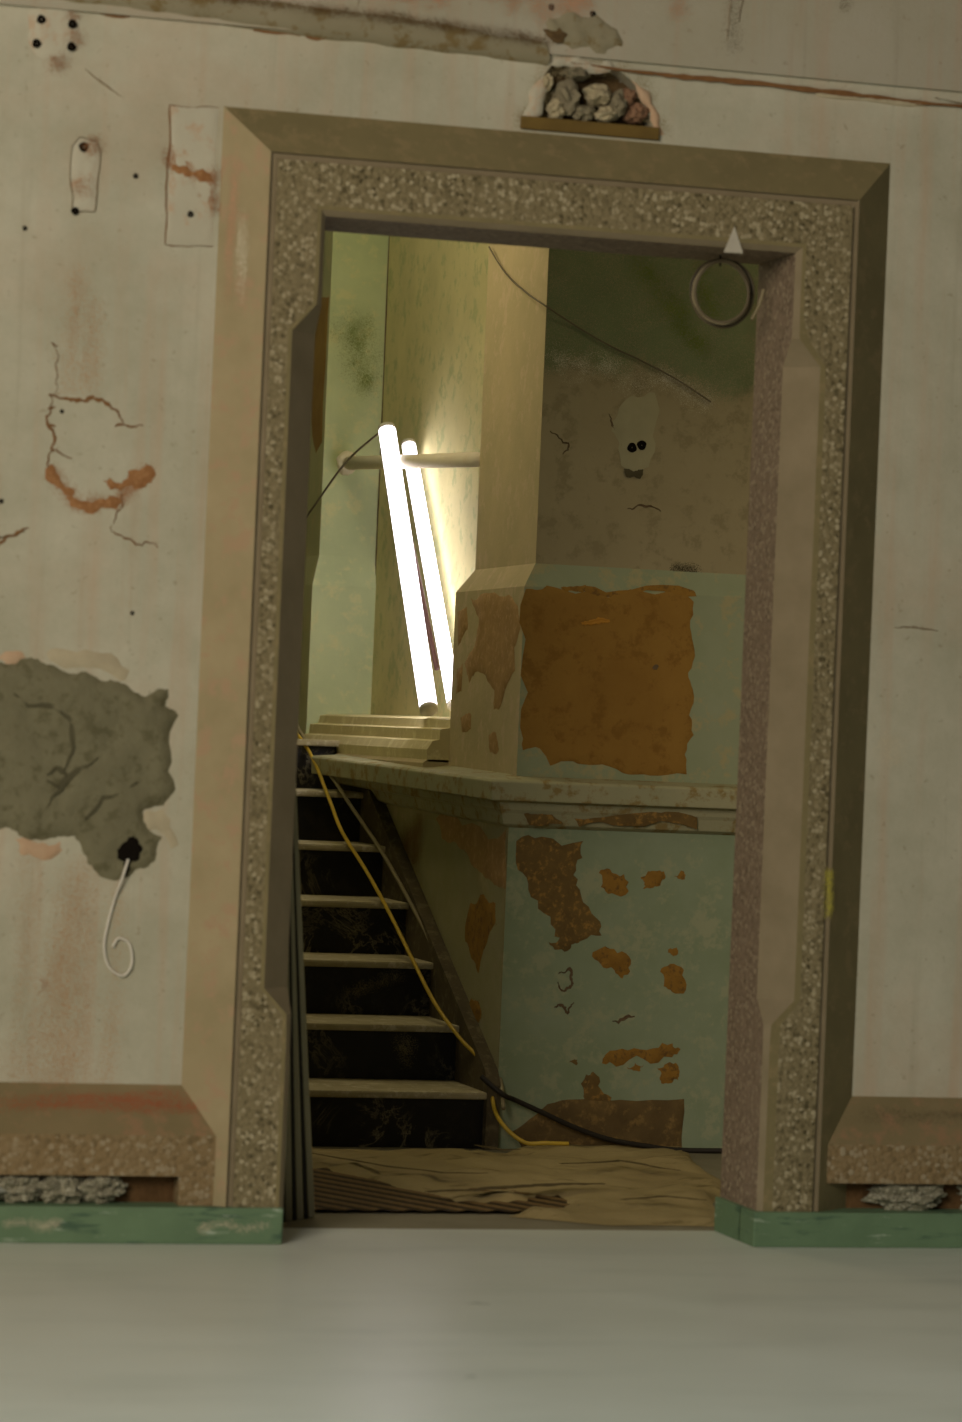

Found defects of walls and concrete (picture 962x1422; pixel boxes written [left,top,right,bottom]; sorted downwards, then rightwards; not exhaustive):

spalling [507,4,674,143]
peeling [456,585,696,776]
peeling [465,894,496,973]
peeling [516,812,697,979]
peeling [660,947,687,994]
peeling [513,1043,684,1148]